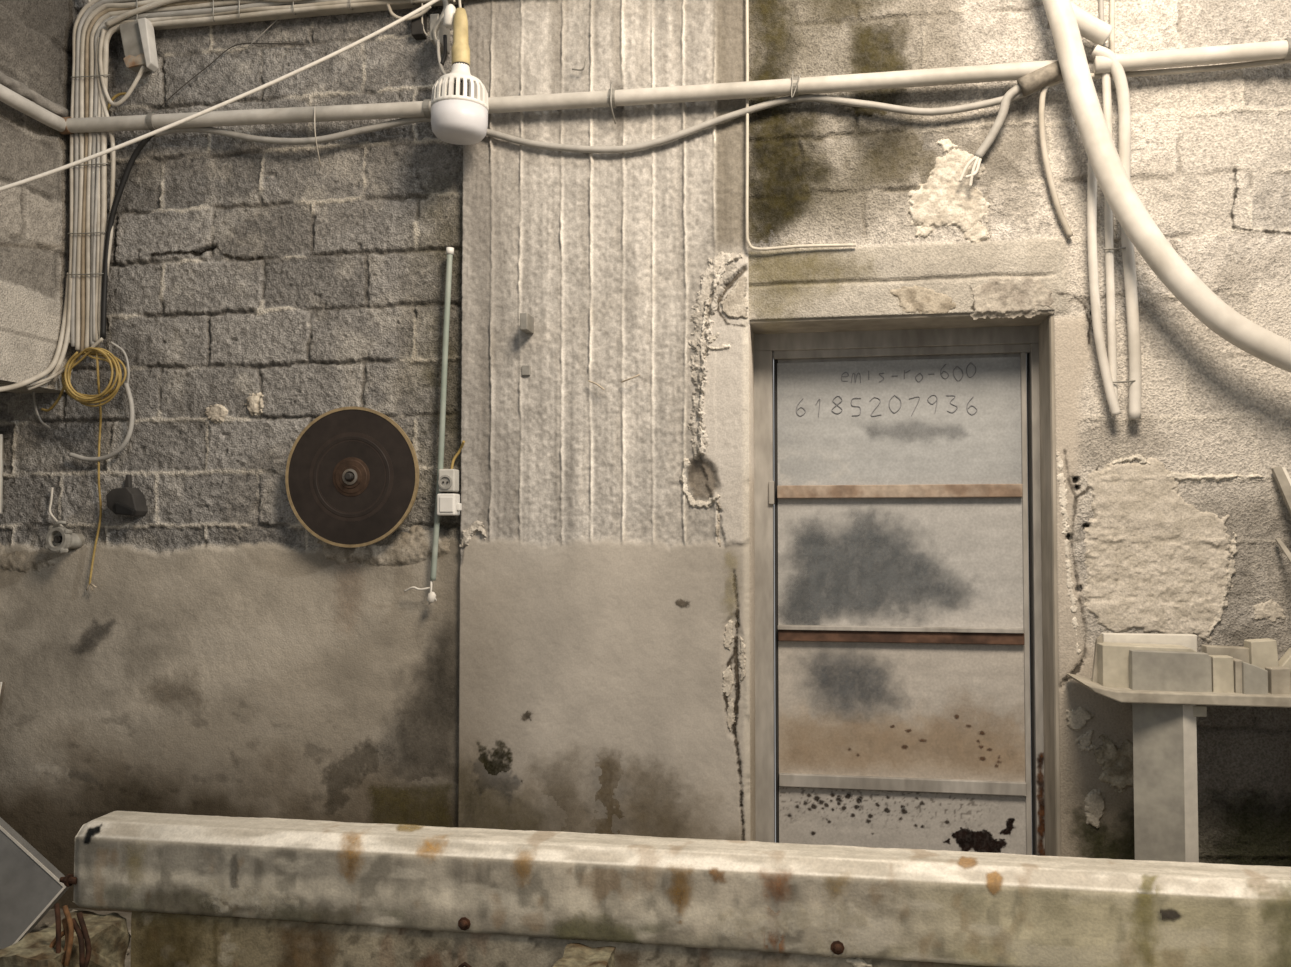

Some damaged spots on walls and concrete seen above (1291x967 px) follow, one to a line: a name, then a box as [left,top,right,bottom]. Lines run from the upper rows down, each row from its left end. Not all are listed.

flaking render [908,139,993,243]
spalling [679,251,748,547]
crack [1056,451,1099,687]
damp [478,742,512,775]
crack [722,572,746,841]
rust [671,872,687,921]
rust [958,857,976,867]
rust [987,871,1002,894]